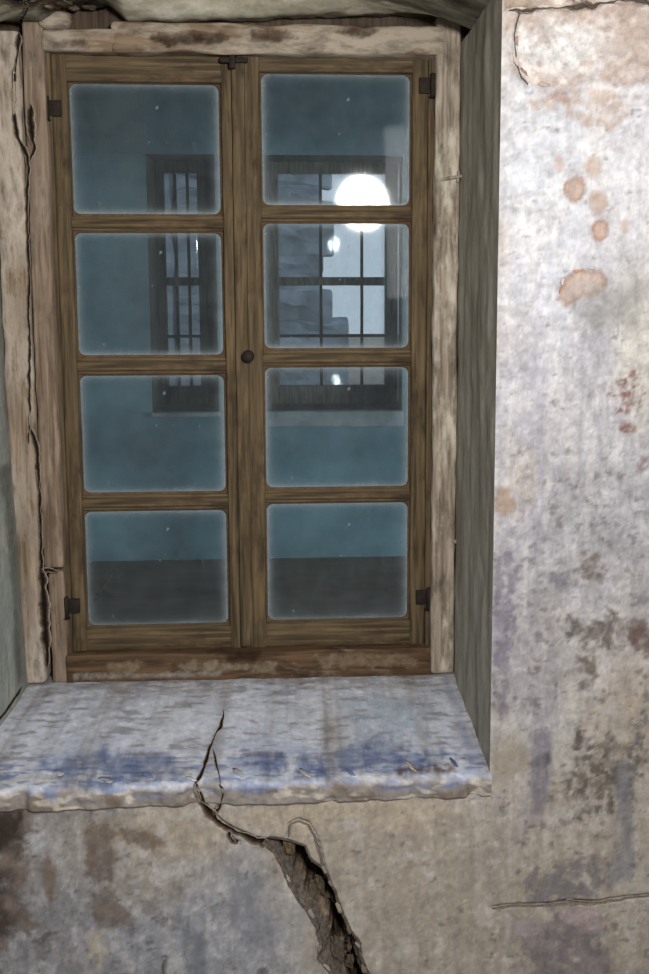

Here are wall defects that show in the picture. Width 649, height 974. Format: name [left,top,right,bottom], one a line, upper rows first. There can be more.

peeling [505,0,649,88]
crack [509,0,649,85]
crack [2,0,75,667]
crack [0,687,22,720]
damp [0,809,45,949]
crack [193,710,370,974]
crack [492,895,649,909]